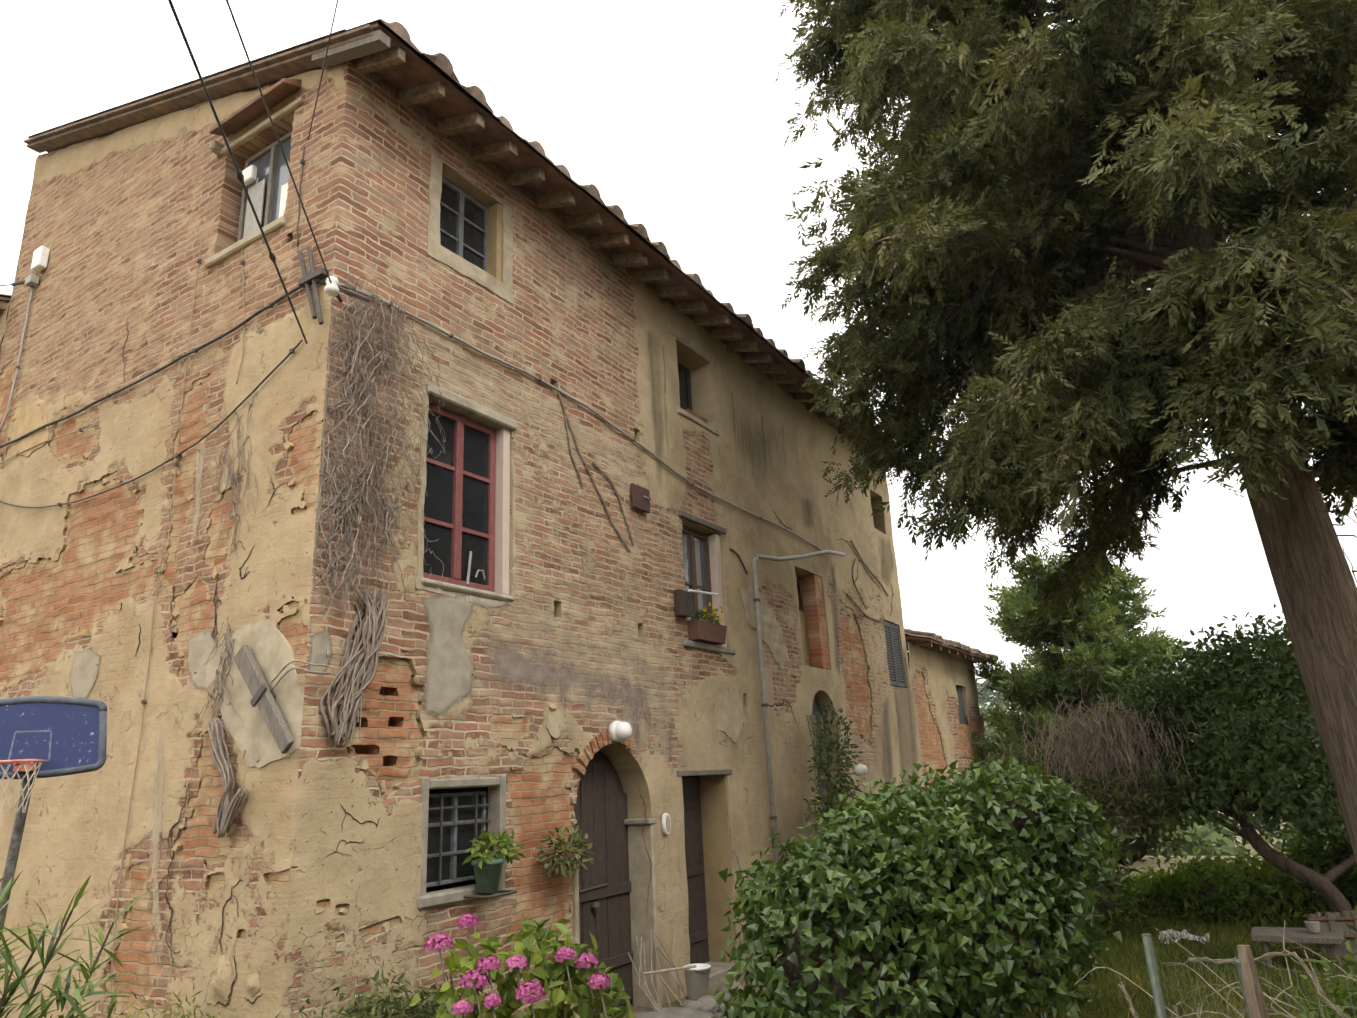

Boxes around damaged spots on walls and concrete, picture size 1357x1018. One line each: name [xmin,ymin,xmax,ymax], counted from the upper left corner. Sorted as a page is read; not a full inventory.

flaking render [0,360,238,694]
flaking render [279,597,309,667]
flaking render [841,614,872,745]
flaking render [106,854,163,1018]
flaking render [172,716,260,889]
flaking render [267,864,292,885]
crack [326,805,380,857]